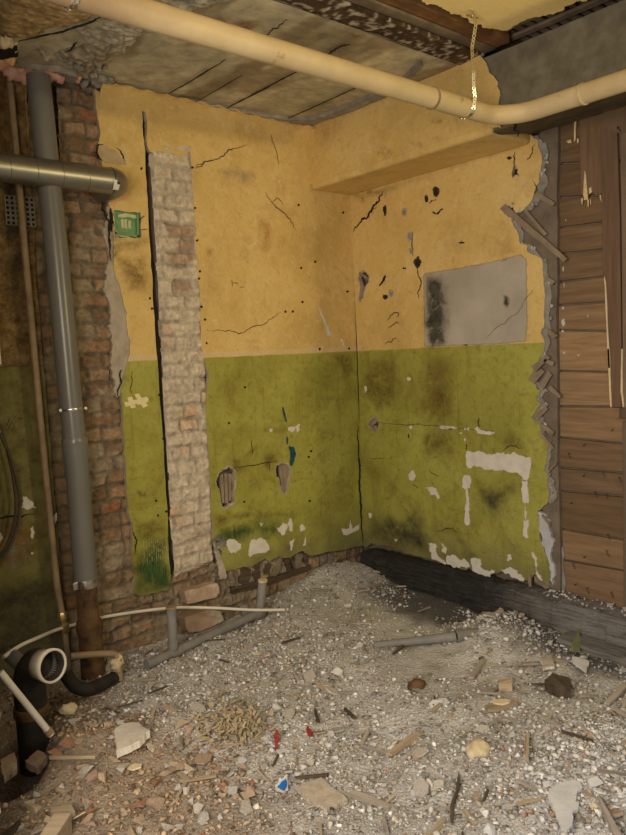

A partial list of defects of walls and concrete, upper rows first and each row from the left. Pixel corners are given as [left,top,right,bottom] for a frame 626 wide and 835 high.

spalling [0,0,151,57]
spalling [155,0,231,12]
spalling [51,81,127,166]
spalling [174,93,386,124]
crack [353,191,384,232]
spalling [424,186,443,215]
leakage [426,280,444,344]
spalling [500,135,568,503]
spalling [62,145,363,652]
peeling [462,451,531,538]
leakage [136,526,169,587]
peeling [428,511,557,589]